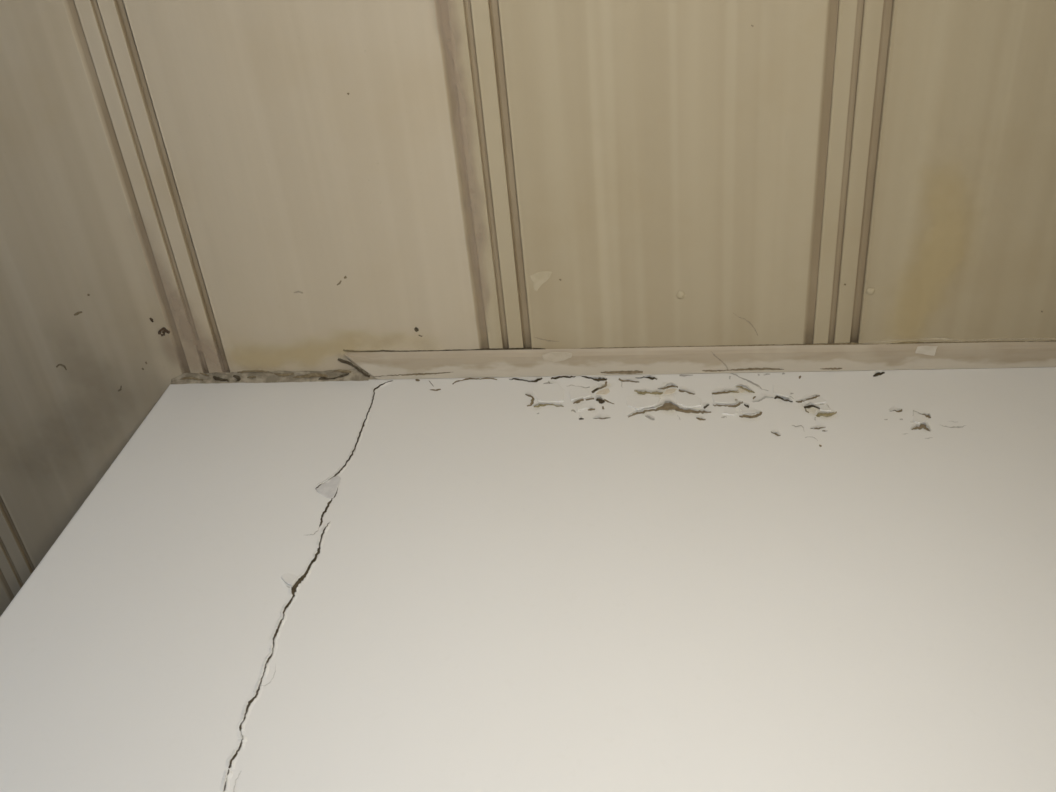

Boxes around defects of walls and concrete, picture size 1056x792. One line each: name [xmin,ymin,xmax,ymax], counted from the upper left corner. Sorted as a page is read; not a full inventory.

crack [581,338,1056,374]
peeling [509,374,837,431]
peeling [910,412,931,431]
crack [171,347,543,792]